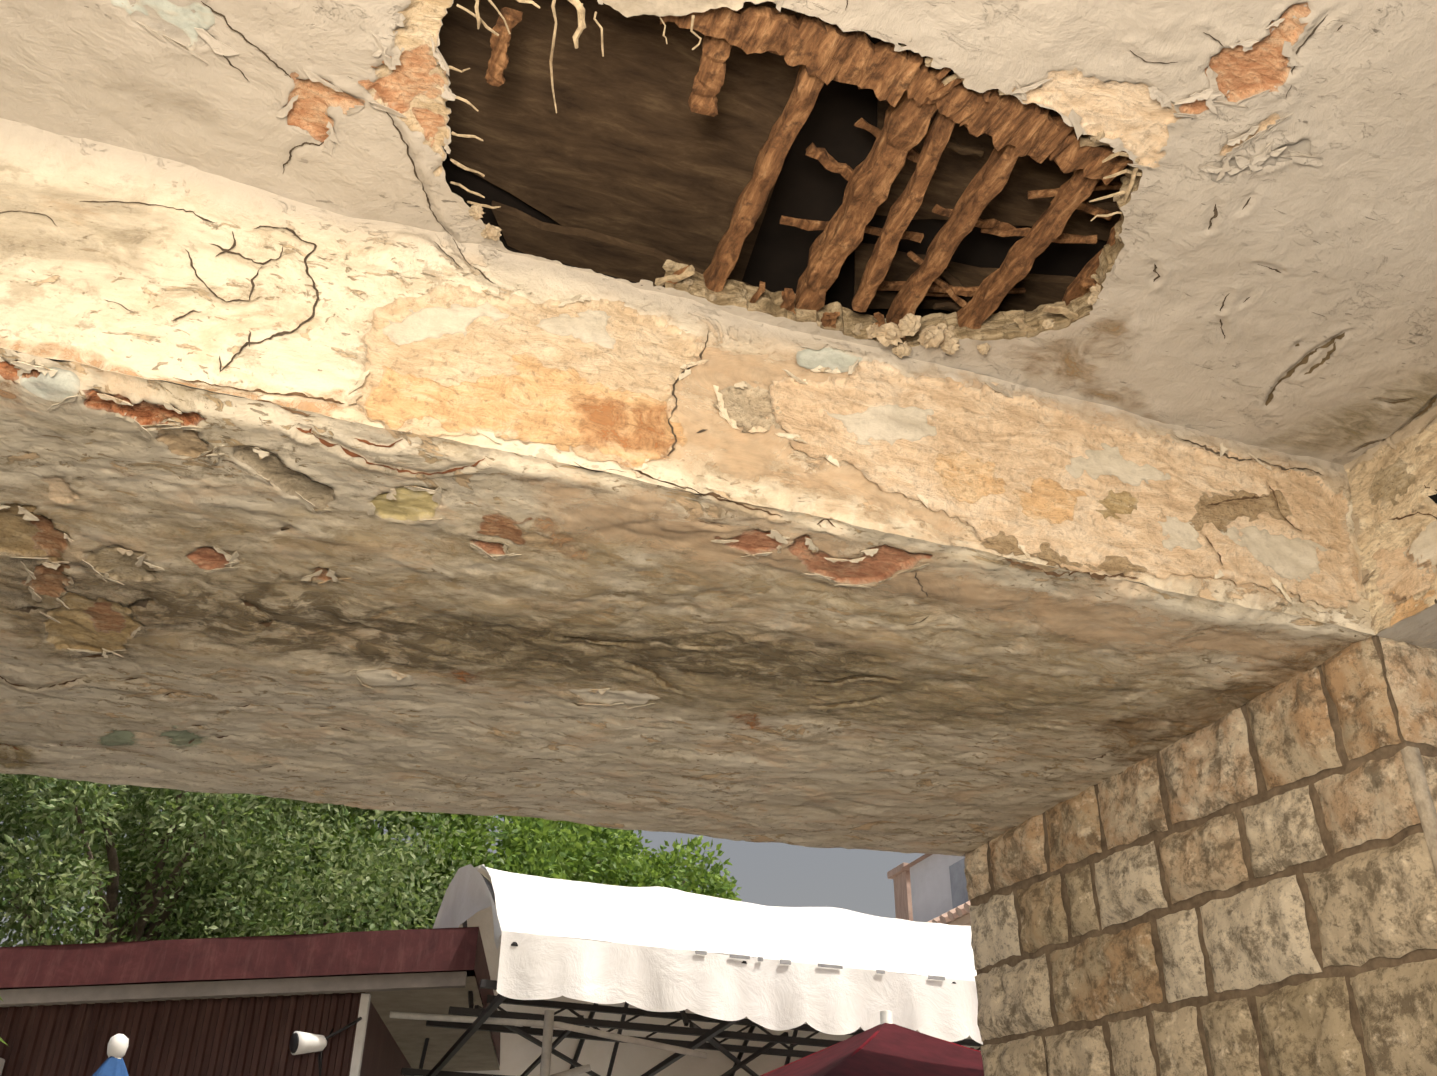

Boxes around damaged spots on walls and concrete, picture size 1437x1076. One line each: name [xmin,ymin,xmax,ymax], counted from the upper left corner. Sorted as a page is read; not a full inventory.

flaking render [276,0,456,177]
flaking render [1012,2,1311,171]
peeling [1200,113,1324,183]
flaking render [0,476,165,658]
flaking render [0,357,335,513]
crack [0,201,485,475]
flaking render [348,284,708,478]
flaking render [711,344,1437,641]
crack [1176,436,1322,475]
spalling [1265,332,1345,406]
crack [1353,396,1437,452]